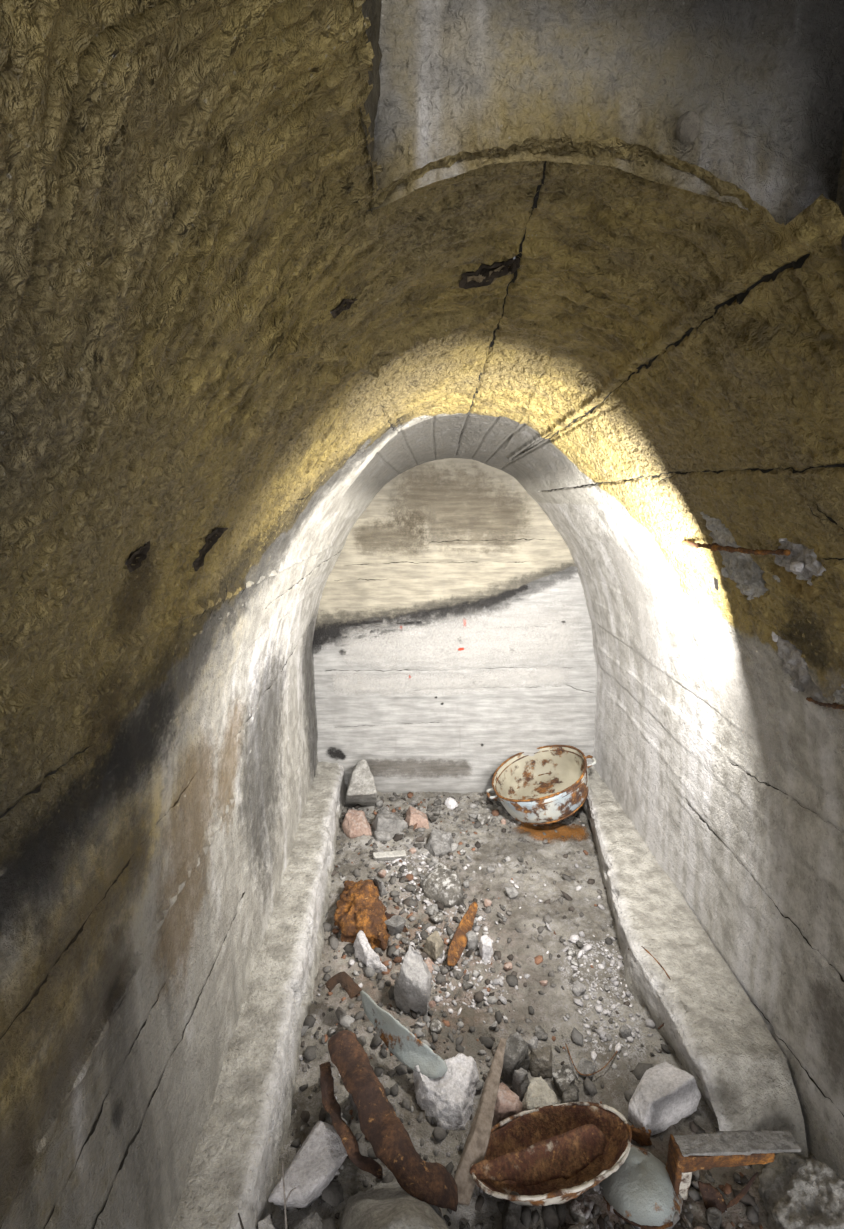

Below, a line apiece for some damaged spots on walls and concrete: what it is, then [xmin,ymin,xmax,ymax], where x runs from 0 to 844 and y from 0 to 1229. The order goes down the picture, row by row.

spalling [467,265,511,283]
crack [458,161,547,444]
crack [515,254,810,457]
crack [541,464,844,492]
spalling [700,512,826,605]
crack [808,502,844,560]
damp [312,585,528,655]
spalling [772,631,844,705]
crack [0,773,196,1039]
crack [44,975,170,1229]
crack [92,892,245,1229]